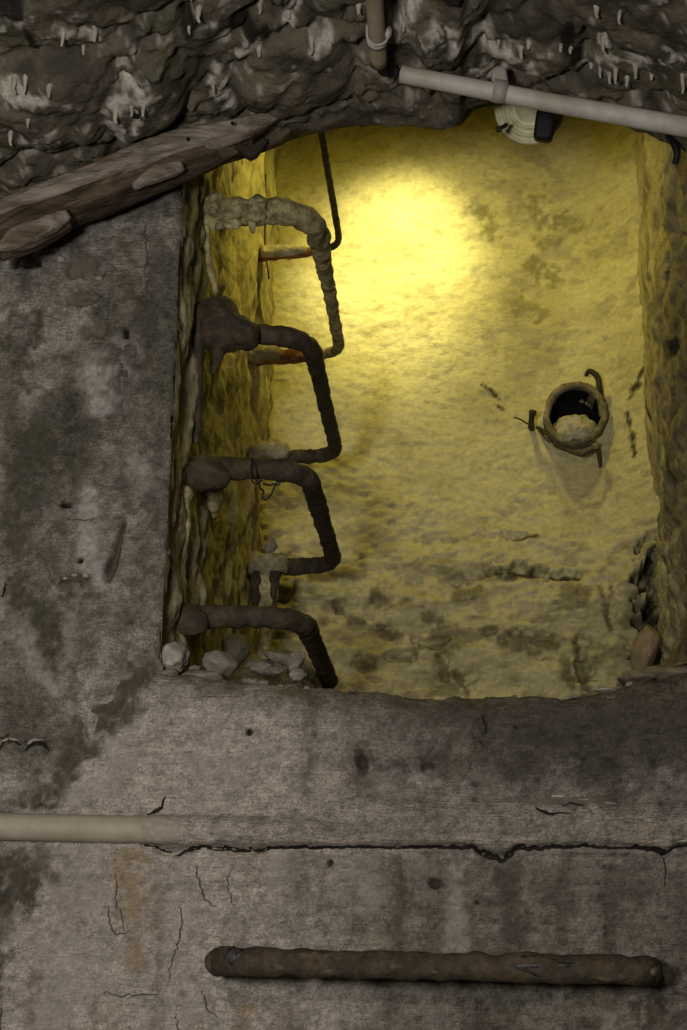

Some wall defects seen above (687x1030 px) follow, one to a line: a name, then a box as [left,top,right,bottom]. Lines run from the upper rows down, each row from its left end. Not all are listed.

damp [82,360,113,415]
efflorescence [78,487,106,586]
crack [0,734,50,752]
damp [23,662,155,808]
crack [147,796,166,815]
crack [535,802,583,815]
damp [0,847,59,979]
crack [104,839,687,997]